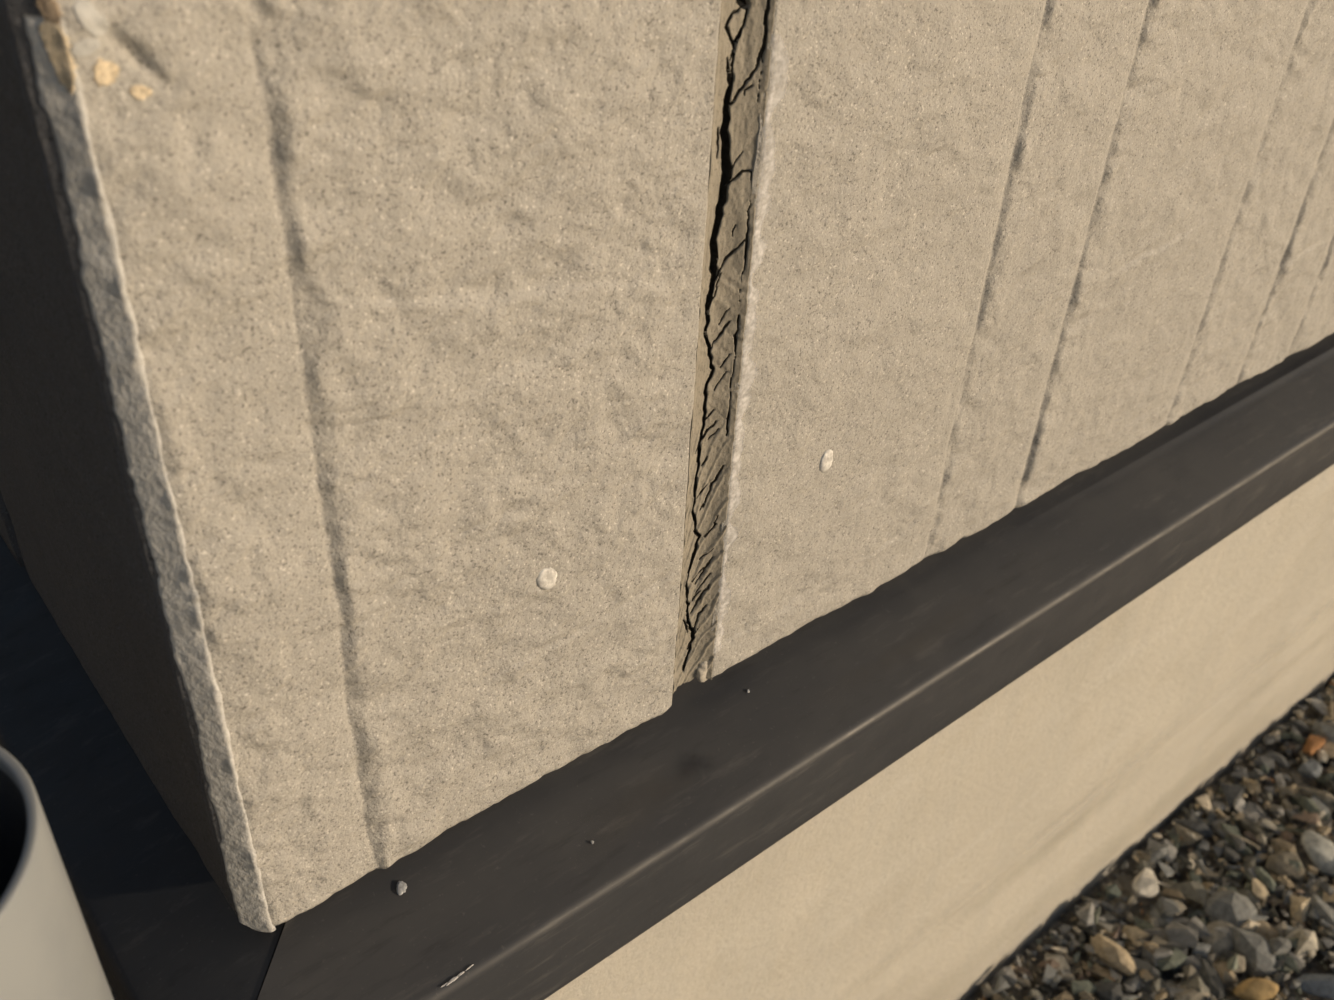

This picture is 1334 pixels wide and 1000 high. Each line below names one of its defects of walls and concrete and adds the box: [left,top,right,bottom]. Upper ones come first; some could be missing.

spalling [35,0,174,100]
crack [682,0,770,671]